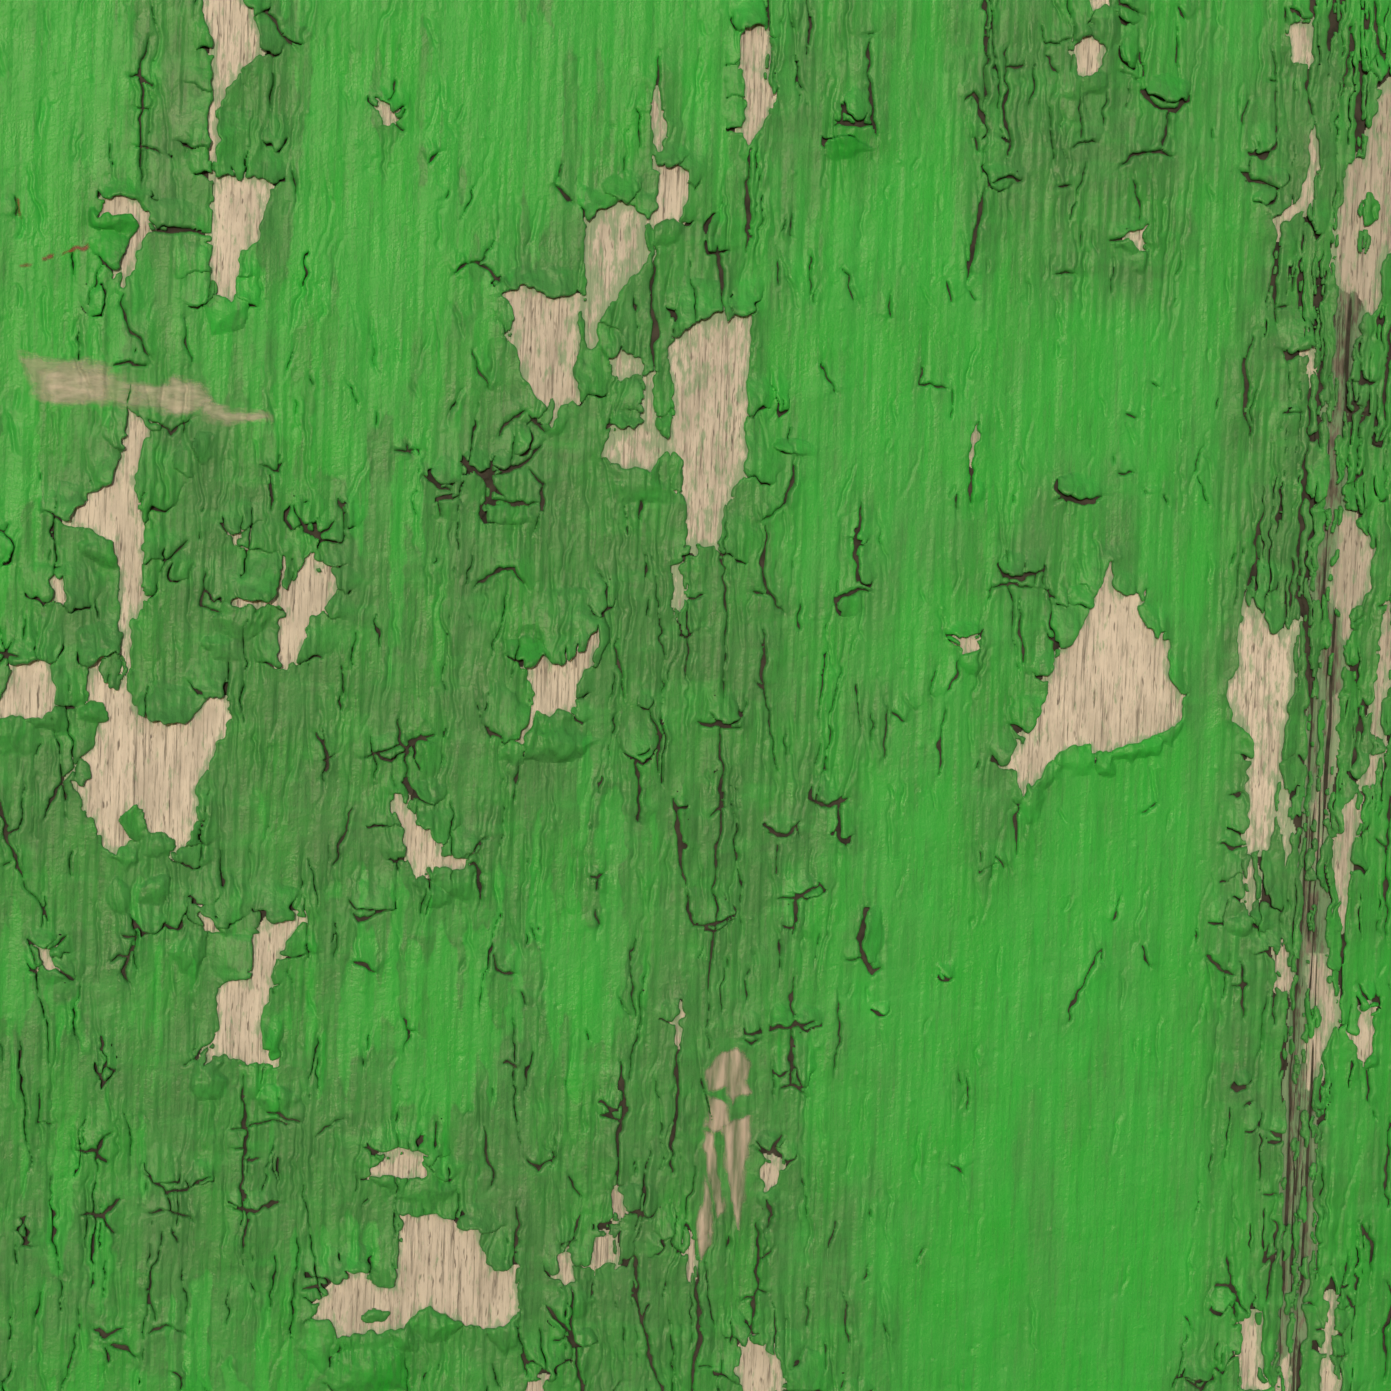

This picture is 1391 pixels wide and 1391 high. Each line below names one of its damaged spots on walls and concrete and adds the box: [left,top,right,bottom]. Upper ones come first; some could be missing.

peeling [76,0,315,377]
peeling [466,0,820,700]
crack [941,0,1034,313]
crack [0,785,60,935]
peeling [0,397,367,1274]
crack [582,865,645,1028]
crack [875,659,953,782]
peeling [981,553,1190,864]
peeling [1208,0,1391,1391]
crack [31,1083,195,1391]
peeling [294,995,874,1391]
crack [1202,949,1391,1390]